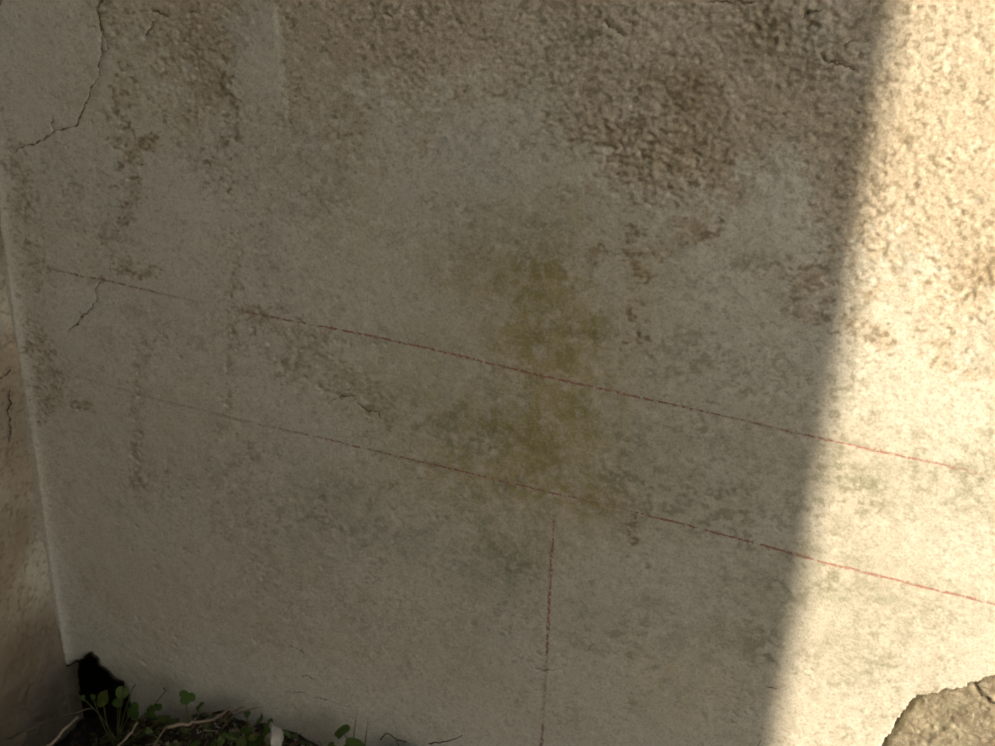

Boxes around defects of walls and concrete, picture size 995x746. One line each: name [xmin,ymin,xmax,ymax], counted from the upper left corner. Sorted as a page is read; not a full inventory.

crack [14,0,108,153]
leakage [206,0,995,746]
flaking render [881,675,995,746]